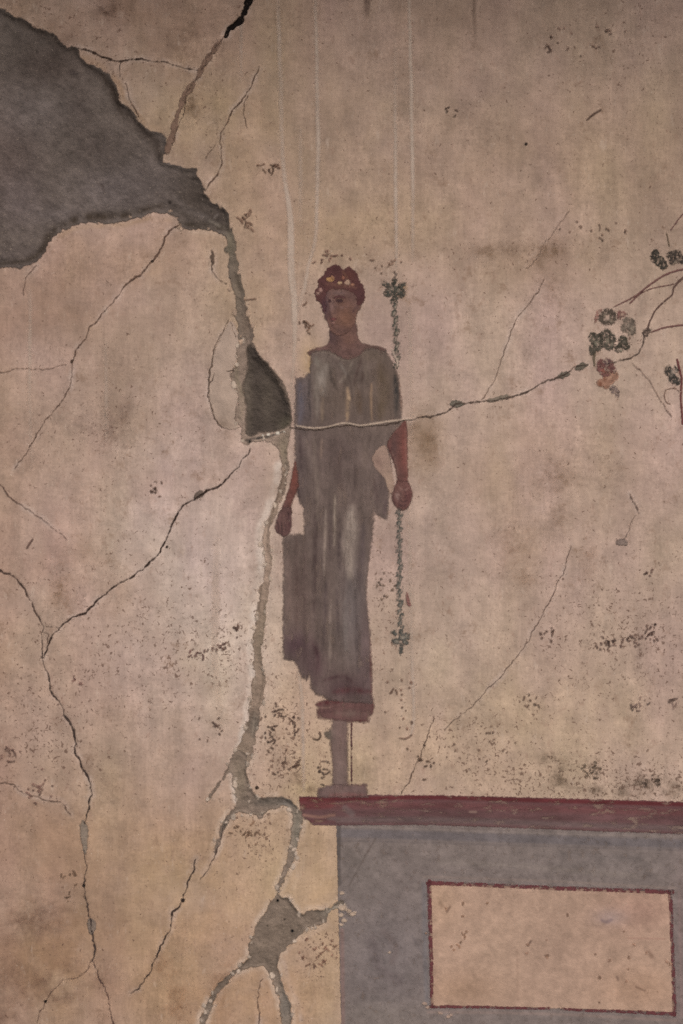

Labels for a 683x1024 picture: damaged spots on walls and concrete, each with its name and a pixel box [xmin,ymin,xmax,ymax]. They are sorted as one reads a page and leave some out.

crack [78,0,253,153]
crack [206,68,259,189]
crack [0,226,178,538]
crack [207,321,236,427]
crack [290,211,671,431]
flaking render [0,8,356,1024]
crack [0,450,250,824]
crack [38,825,225,1024]